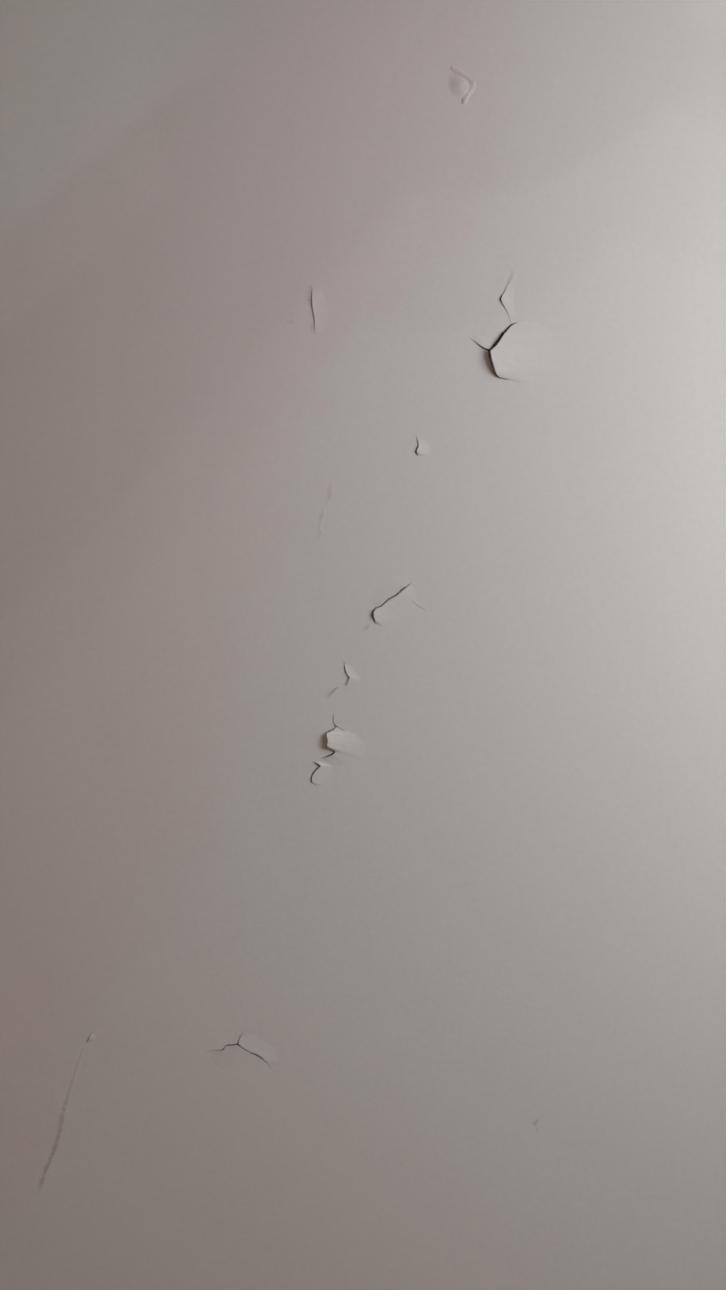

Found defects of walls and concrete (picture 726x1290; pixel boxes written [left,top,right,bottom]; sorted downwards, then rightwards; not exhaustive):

crack [362,575,428,632]
crack [325,660,360,699]
peeling [310,713,366,787]